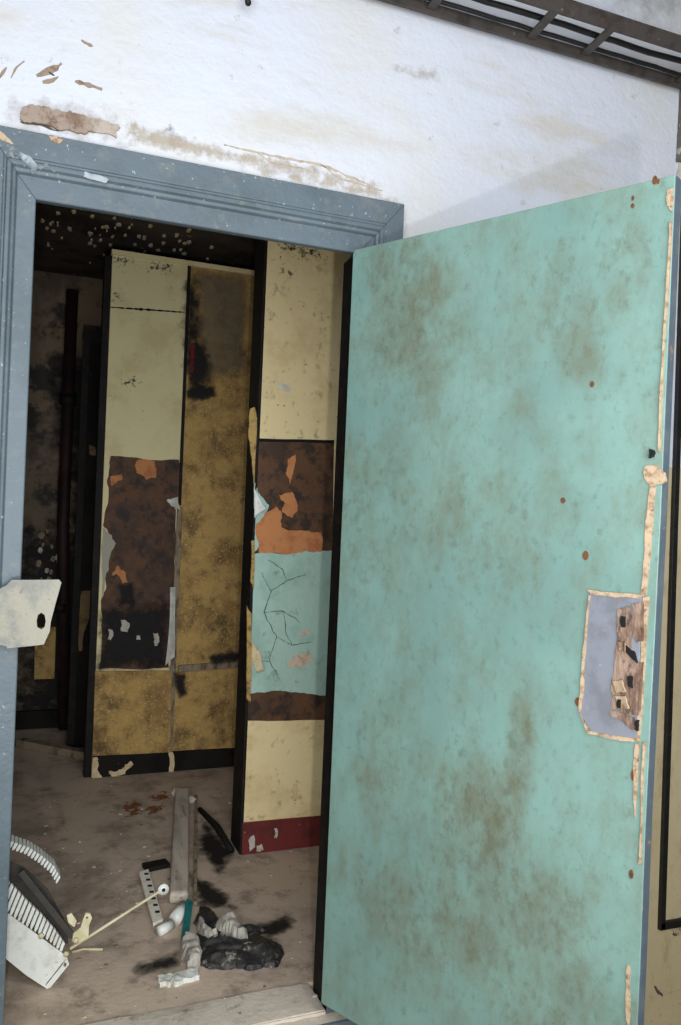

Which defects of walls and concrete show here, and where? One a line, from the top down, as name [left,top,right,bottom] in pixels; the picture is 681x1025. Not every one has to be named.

spalling [36,63,62,84]
spalling [75,80,102,91]
spalling [20,104,121,144]
peeling [0,131,58,175]
peeling [83,172,108,184]
leakage [149,134,382,194]
peeling [98,456,181,670]
peeling [247,438,334,721]
crack [262,560,310,680]